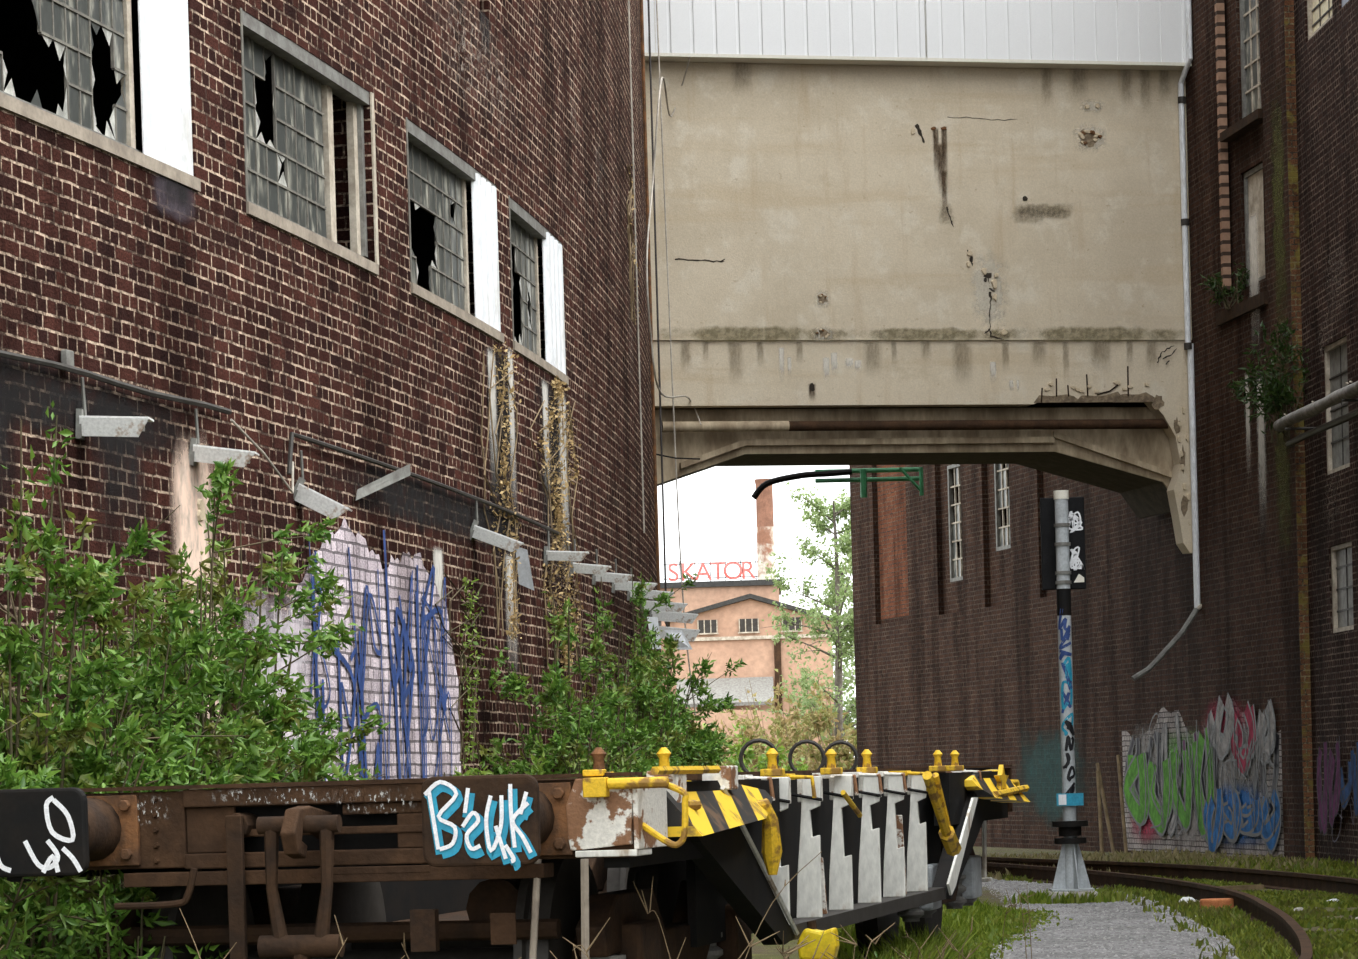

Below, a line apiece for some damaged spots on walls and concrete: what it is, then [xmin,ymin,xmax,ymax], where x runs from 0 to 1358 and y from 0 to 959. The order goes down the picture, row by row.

corrosion [931,126,947,198]
crack [946,207,1008,340]
water stain [701,328,834,369]
water stain [880,329,975,339]
water stain [1048,328,1169,340]
water stain [809,353,860,395]
spalling [1034,366,1164,410]
spalling [1174,407,1190,516]